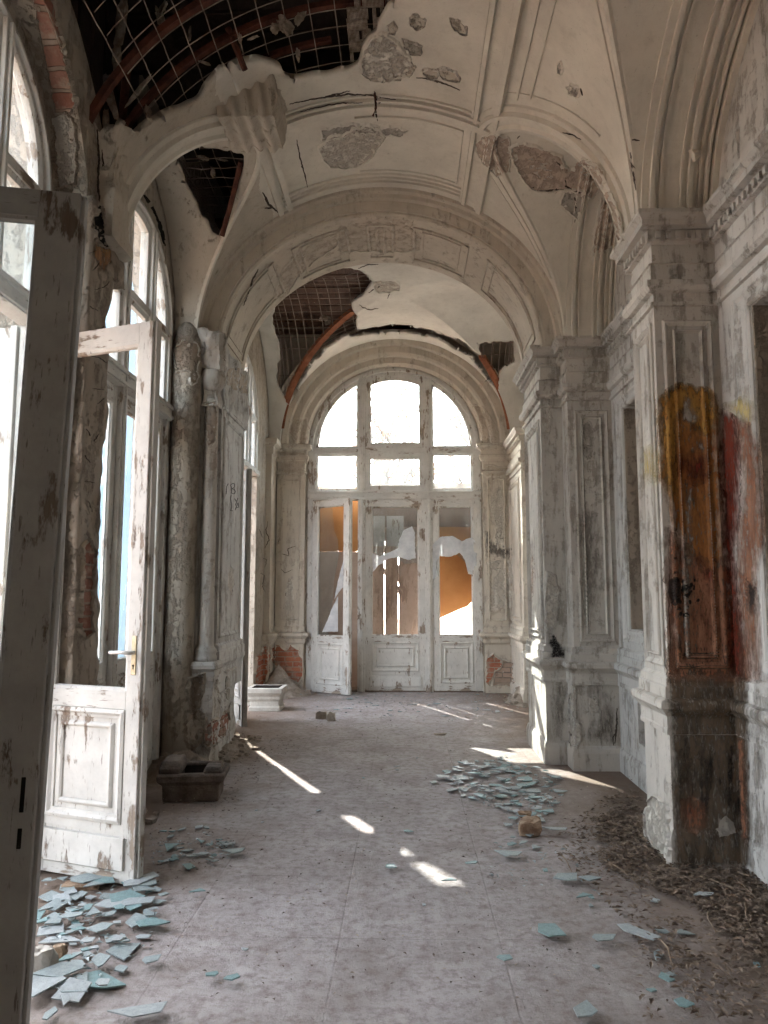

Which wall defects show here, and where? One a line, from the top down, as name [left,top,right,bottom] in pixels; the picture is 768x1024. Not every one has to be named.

spalling [33,0,461,130]
crack [290,91,396,121]
spalling [317,121,408,170]
spalling [449,17,468,36]
spalling [179,147,243,237]
spalling [474,132,625,256]
spalling [273,271,402,444]
flaking render [77,538,99,641]
flaking render [253,642,305,685]
flaking render [485,653,515,687]
leakage [667,632,760,866]